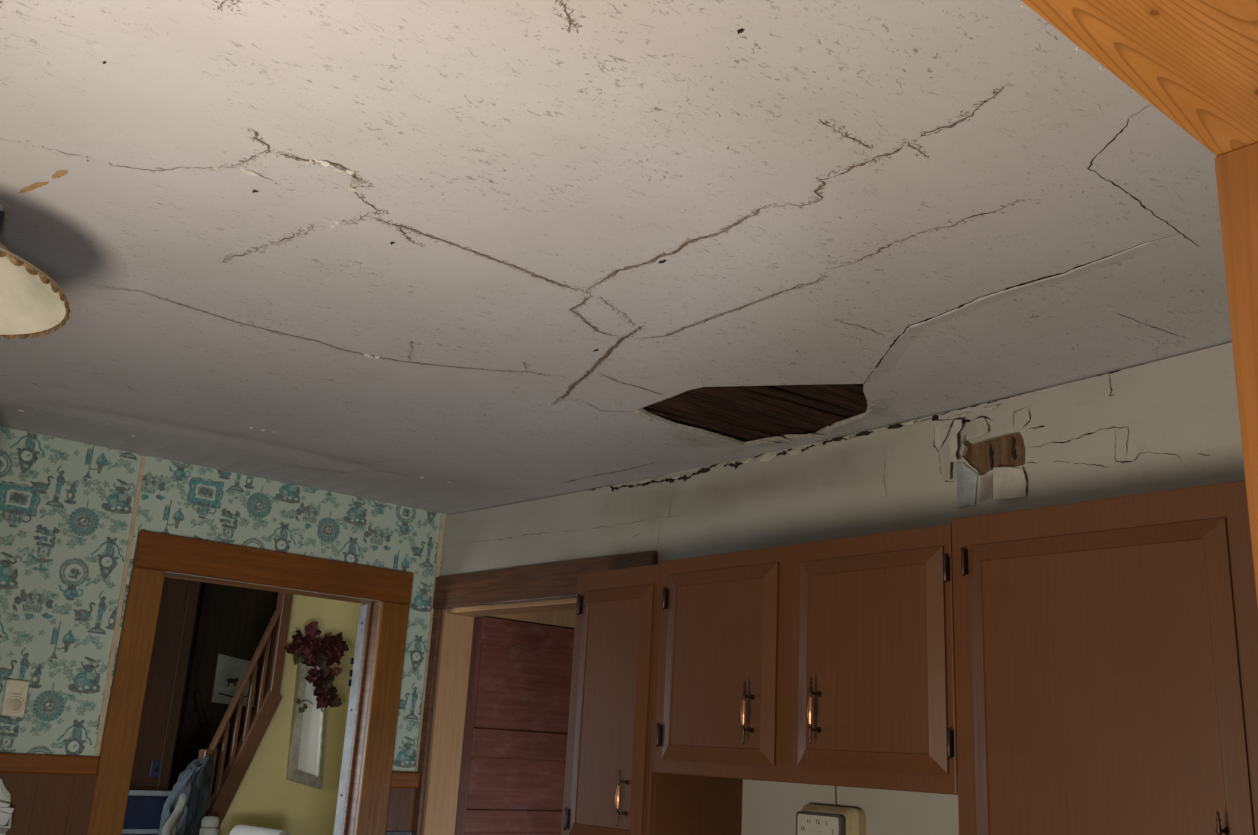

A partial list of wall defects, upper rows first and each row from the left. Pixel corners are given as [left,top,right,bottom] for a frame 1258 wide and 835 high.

crack [214,0,242,11]
crack [554,0,584,34]
crack [0,85,1039,412]
spalling [933,417,1027,508]